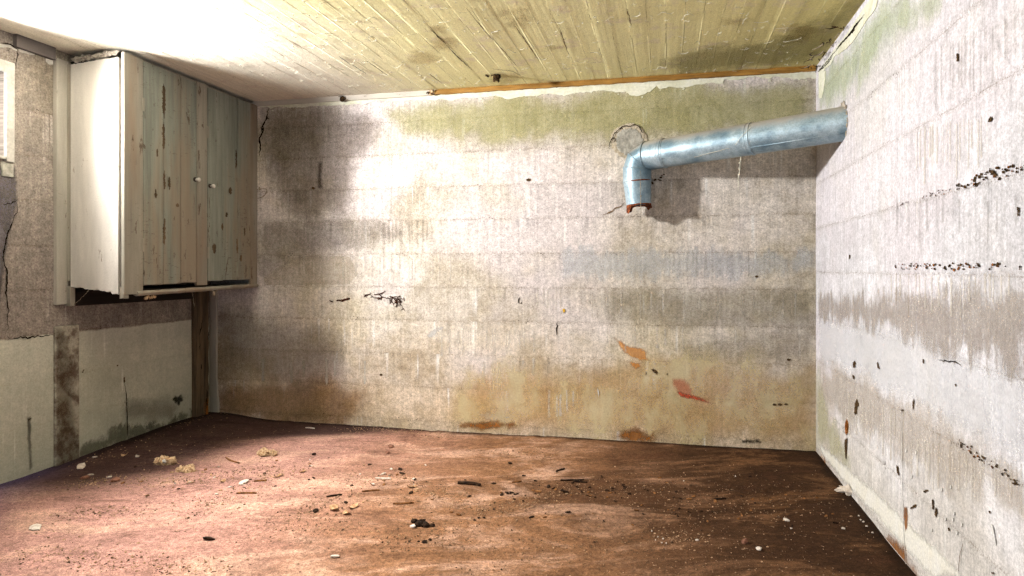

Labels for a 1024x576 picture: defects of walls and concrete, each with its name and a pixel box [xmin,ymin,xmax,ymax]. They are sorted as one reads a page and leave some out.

crack [259,108,269,156]
crack [609,124,646,147]
spalling [922,164,1024,199]
crack [3,201,50,339]
spalling [895,262,1006,271]
corrosion [619,341,647,368]
corrosion [460,421,514,430]
corrosion [618,429,653,442]